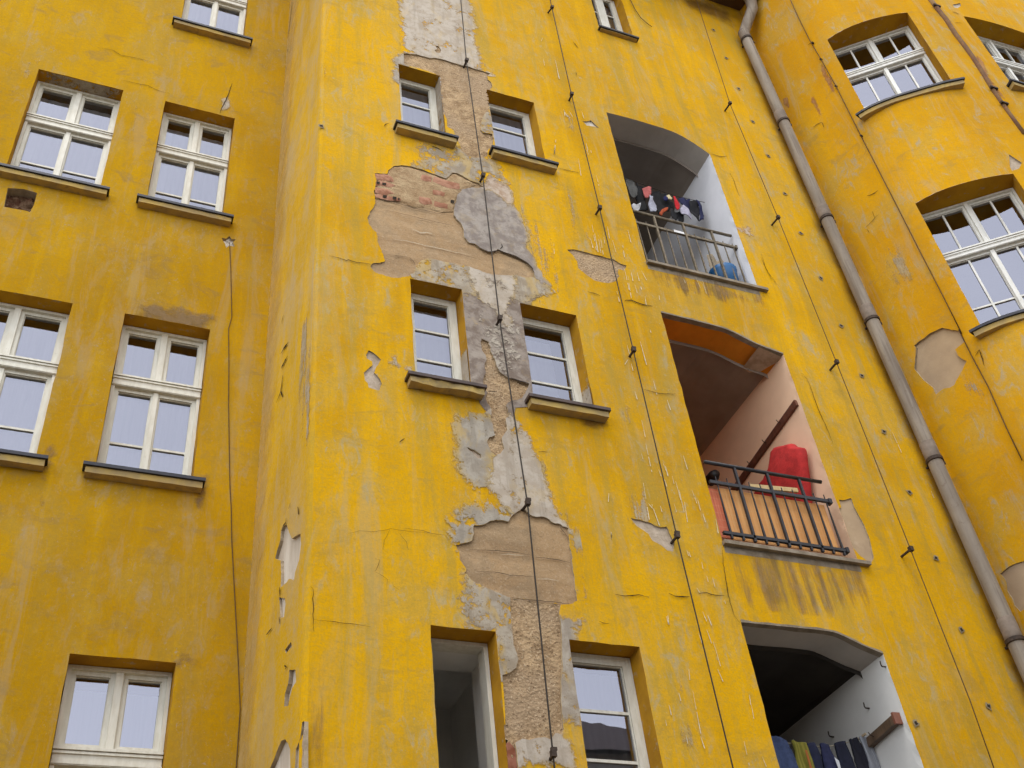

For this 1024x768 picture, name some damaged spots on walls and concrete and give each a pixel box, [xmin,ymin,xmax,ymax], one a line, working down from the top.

flaking render [568,249,627,283]
flaking render [364,0,587,768]
flaking render [914,328,979,394]
flaking render [631,492,675,551]
flaking render [839,498,874,562]
flaking render [275,525,301,618]
water stain [757,561,835,611]
flaking render [1001,561,1024,612]